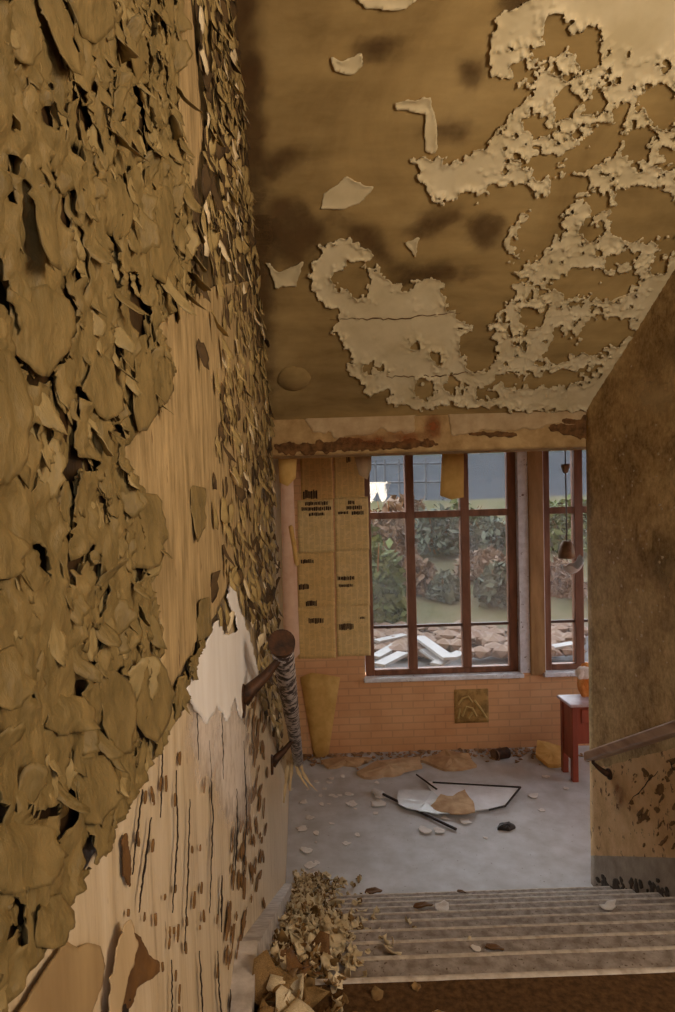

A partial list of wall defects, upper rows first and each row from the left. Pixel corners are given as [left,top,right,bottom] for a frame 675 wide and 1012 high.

leakage [241,61,291,209]
leakage [356,230,383,255]
leakage [418,268,451,279]
peeling [308,0,675,440]
peeling [0,0,438,1012]
spalling [629,758,675,849]